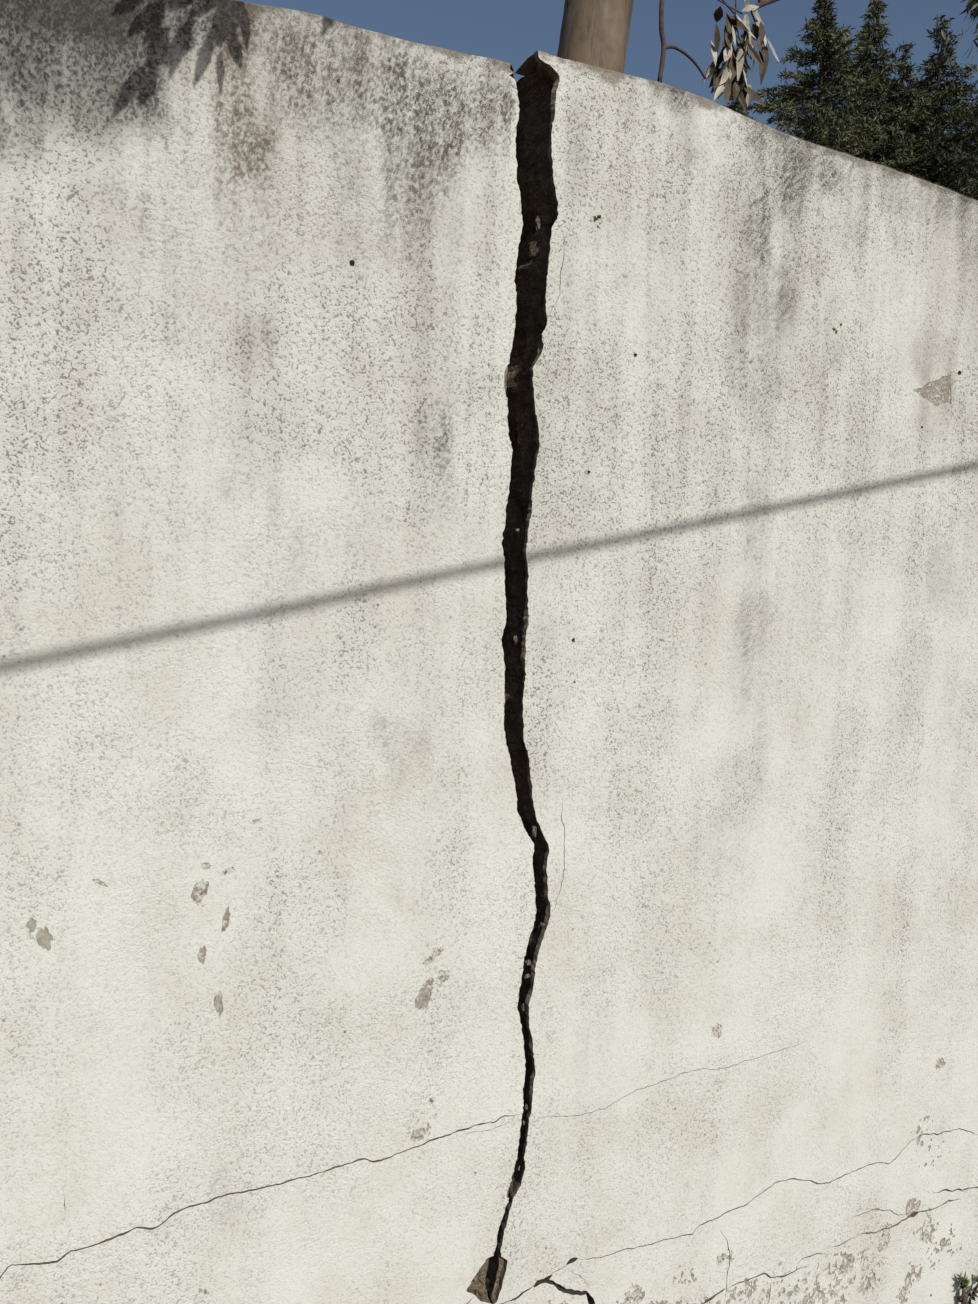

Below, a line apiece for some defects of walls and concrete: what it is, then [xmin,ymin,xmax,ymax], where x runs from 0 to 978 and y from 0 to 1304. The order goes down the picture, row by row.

flaking render [913,374,952,406]
crack [0,51,595,1304]
peeling [191,863,235,906]
peeling [26,917,53,951]
peeling [221,906,230,933]
peeling [197,946,207,966]
peeling [214,990,223,1018]
crack [587,1128,977,1265]
peeling [672,1222,891,1304]
crack [702,1186,978,1304]
peeling [896,1198,962,1304]
peeling [616,1284,682,1304]